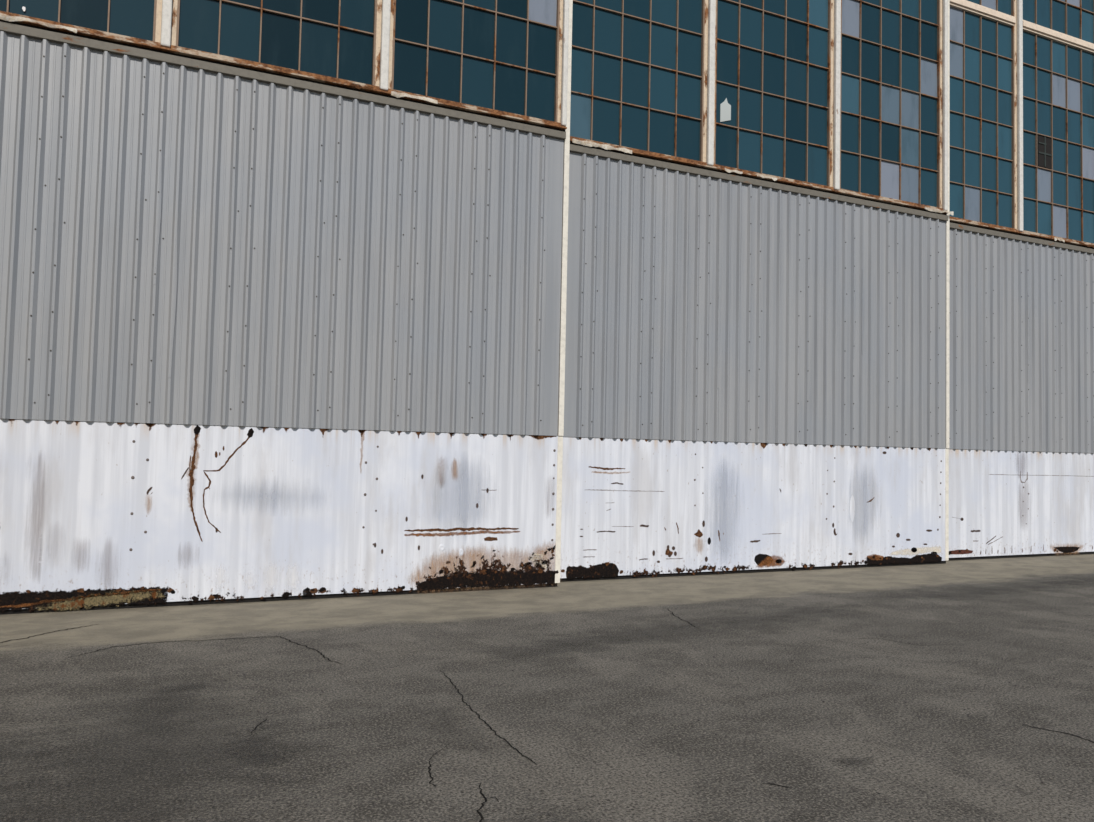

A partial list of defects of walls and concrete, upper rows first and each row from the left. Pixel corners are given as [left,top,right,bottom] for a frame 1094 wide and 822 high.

rust [181,425,203,542]
crack [203,428,254,533]
rust [0,586,244,612]
rust [260,527,981,601]
crack [0,624,341,664]
crack [440,670,536,764]
crack [428,744,449,786]
crack [477,783,499,822]